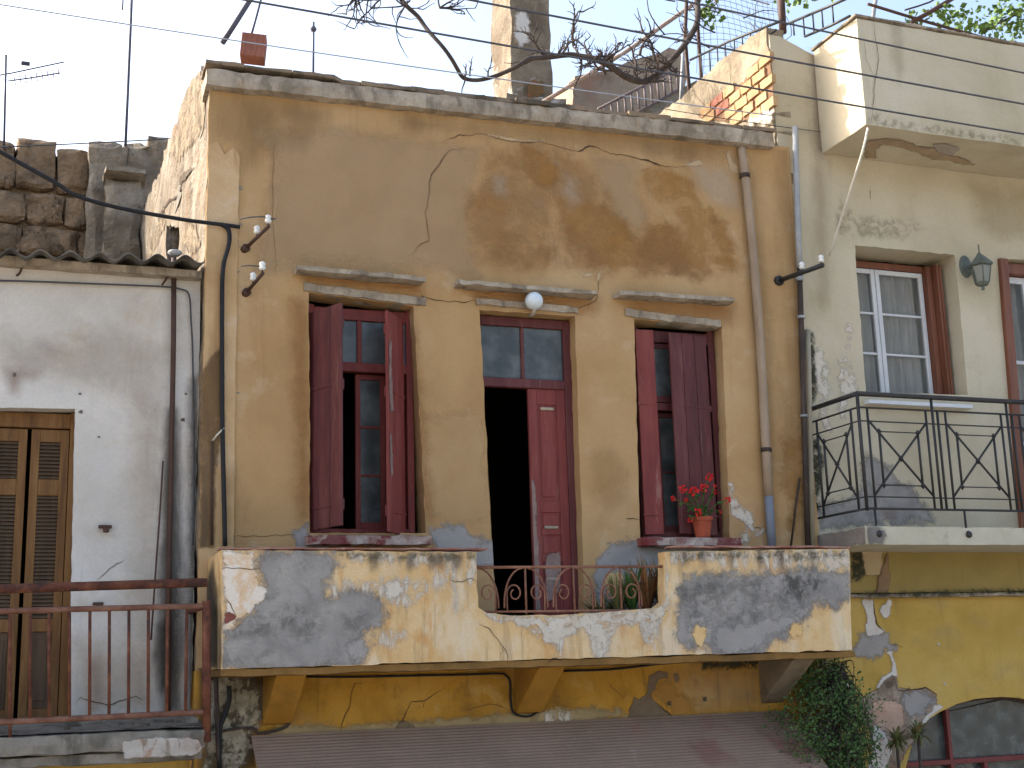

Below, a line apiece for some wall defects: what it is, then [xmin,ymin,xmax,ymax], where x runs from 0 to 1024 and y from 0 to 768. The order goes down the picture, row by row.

crack [414,133,702,252]
peeling [864,139,974,165]
peeling [813,323,857,432]
peeling [332,551,476,610]
spalling [485,480,946,768]
peeling [266,671,707,735]